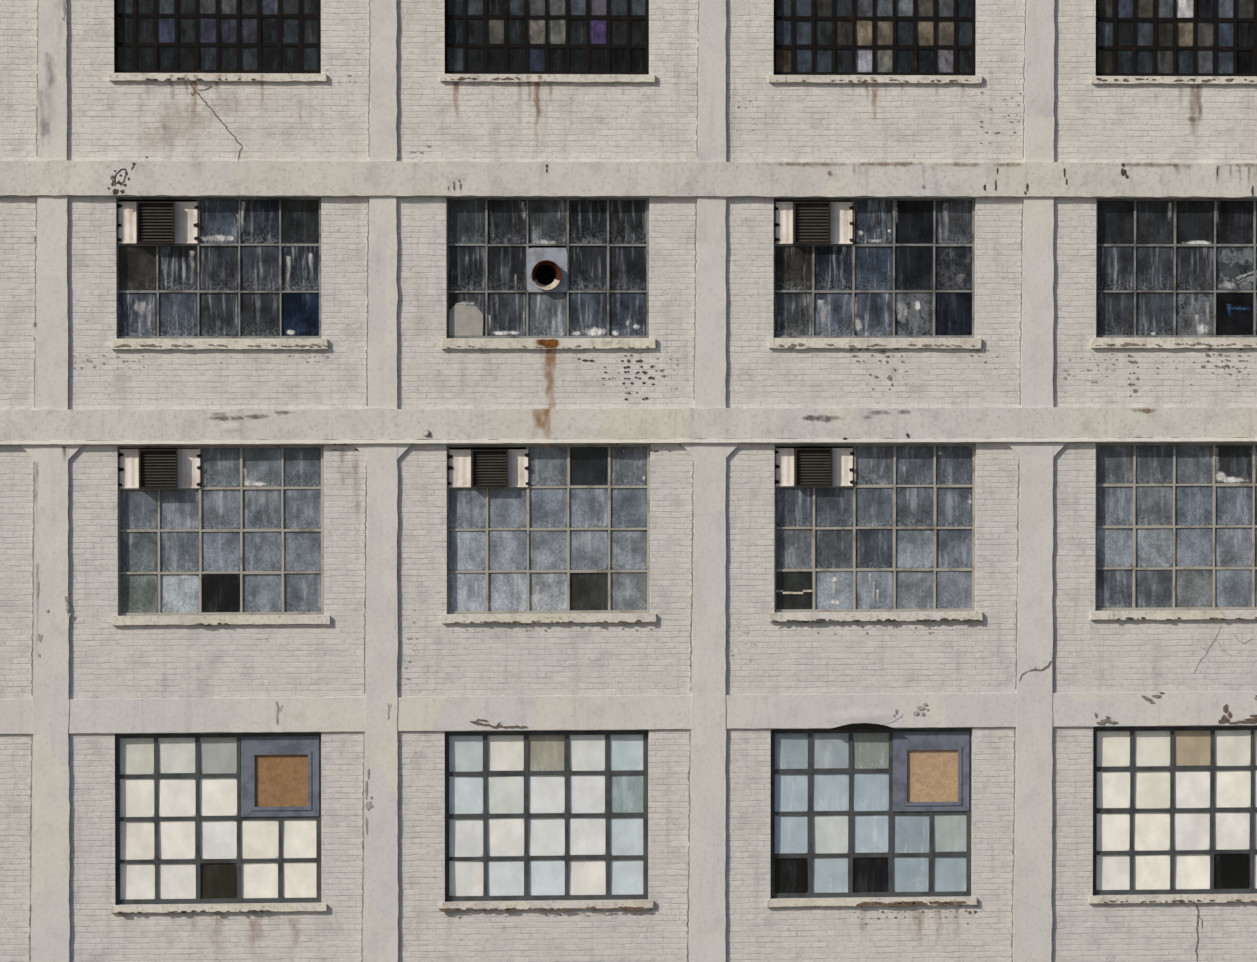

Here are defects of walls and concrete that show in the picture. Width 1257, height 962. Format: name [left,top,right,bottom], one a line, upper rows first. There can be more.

crack [1020,0,1028,157]
crack [190,83,242,160]
crack [1017,200,1025,404]
corrosion [538,339,558,390]
peeling [568,345,678,400]
crack [1015,460,1052,689]
crack [1194,627,1251,674]
spalling [1218,704,1257,724]
crack [1009,729,1017,962]
crack [1195,904,1203,961]